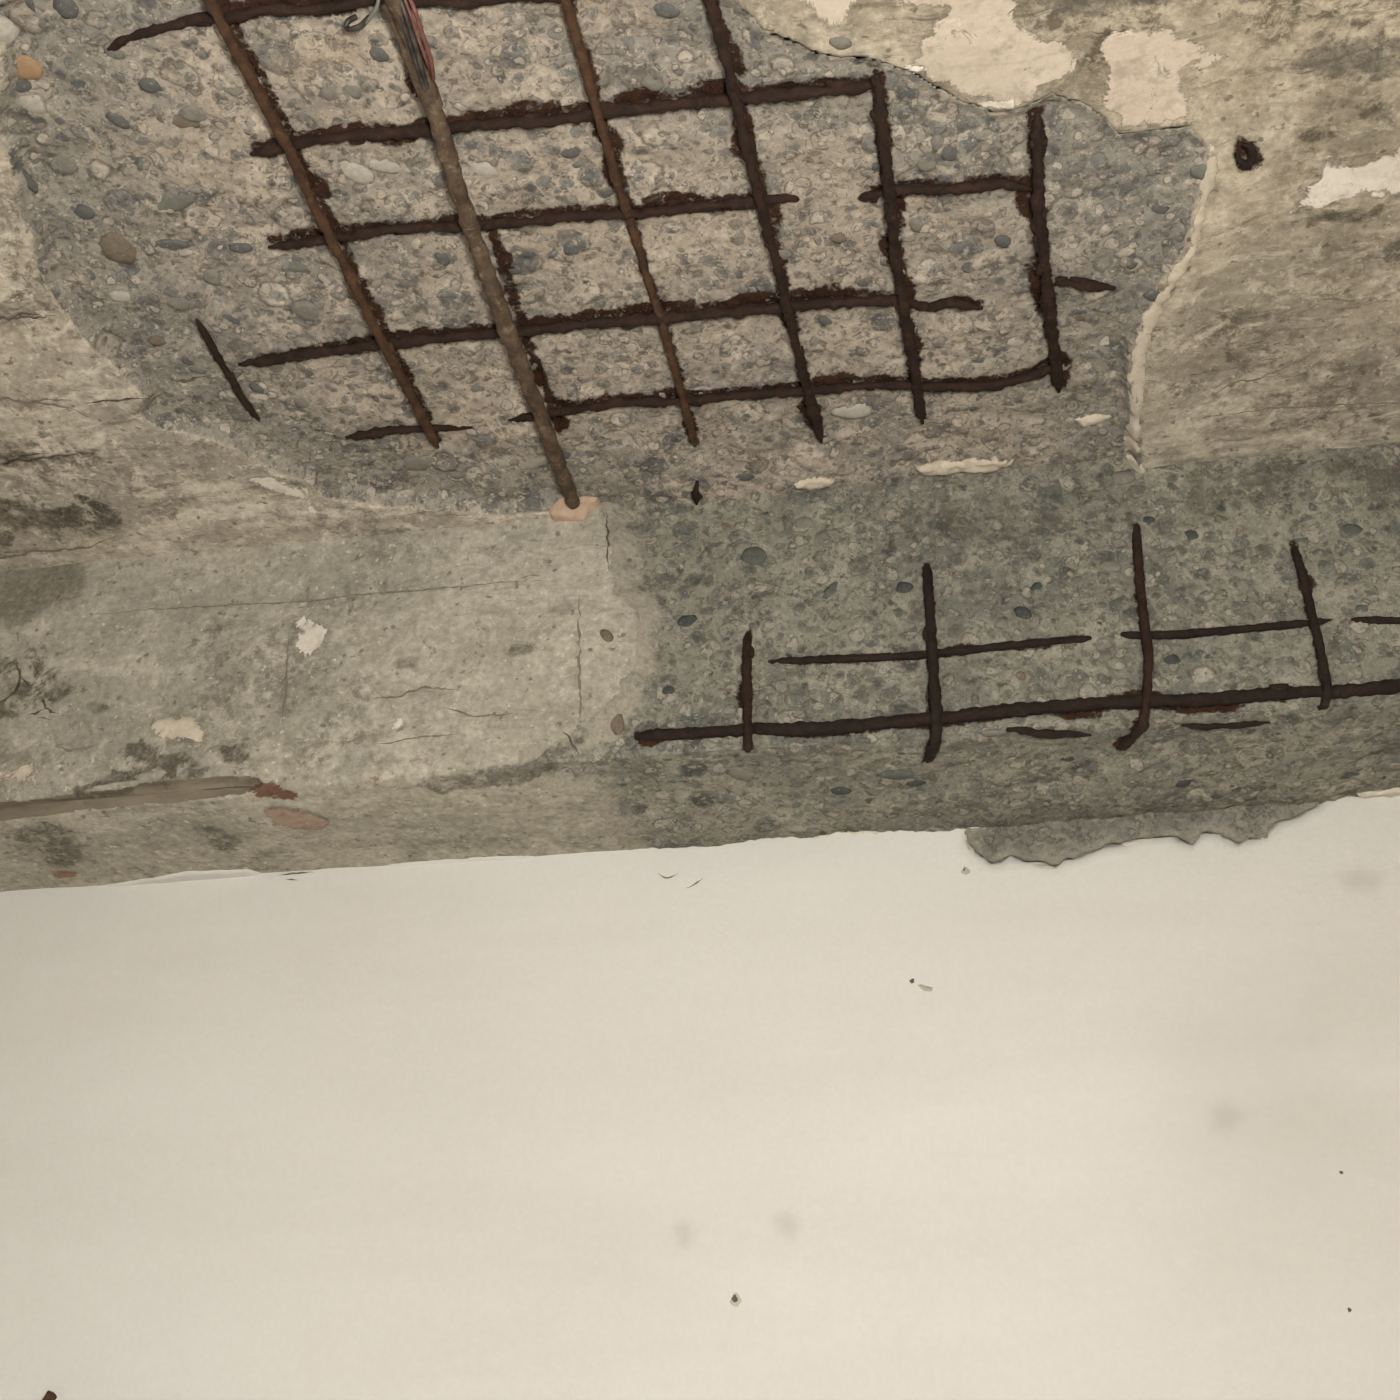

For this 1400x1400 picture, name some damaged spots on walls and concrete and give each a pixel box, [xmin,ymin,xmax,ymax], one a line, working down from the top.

rust [1233,136,1264,171]
rust [216,0,1073,443]
spalling [0,0,1400,875]
rust [1298,571,1322,708]
rust [634,731,670,747]
rust [784,685,1261,763]
peeling [101,869,261,886]